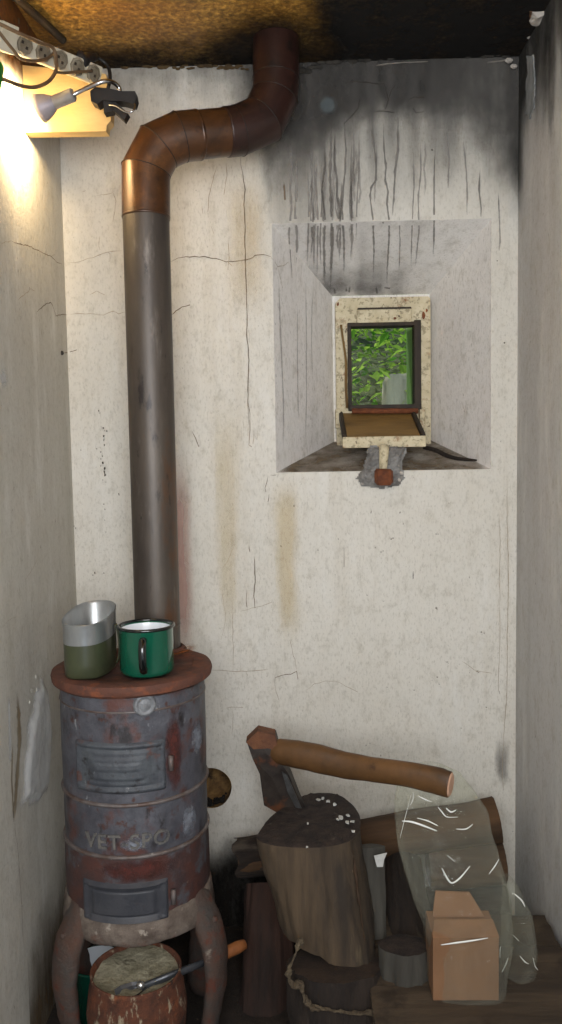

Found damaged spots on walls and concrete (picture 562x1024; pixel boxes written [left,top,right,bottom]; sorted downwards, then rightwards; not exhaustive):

damp [283,128,435,269]
crack [18,290,123,316]
crack [171,158,288,447]